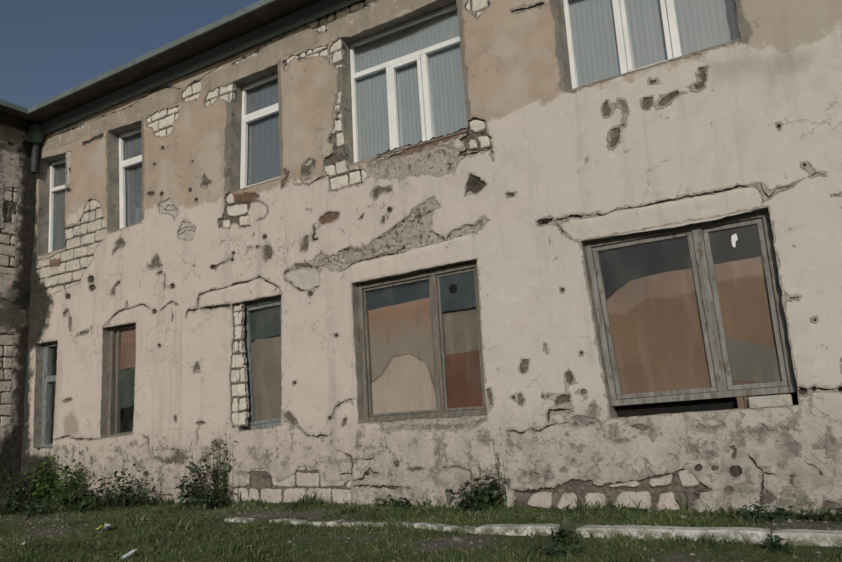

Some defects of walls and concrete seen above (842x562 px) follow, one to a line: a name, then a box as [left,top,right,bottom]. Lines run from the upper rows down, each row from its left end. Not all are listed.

flaking render [282,38,345,70]
flaking render [145,66,236,149]
flaking render [642,91,679,110]
flaking render [301,89,493,200]
flaking render [218,191,259,229]
crack [537,173,824,234]
flaking render [36,198,106,336]
flaking render [284,196,488,296]
crack [103,271,279,326]
flaking render [230,304,249,428]
flaking render [232,465,352,505]
flaking render [511,464,719,512]